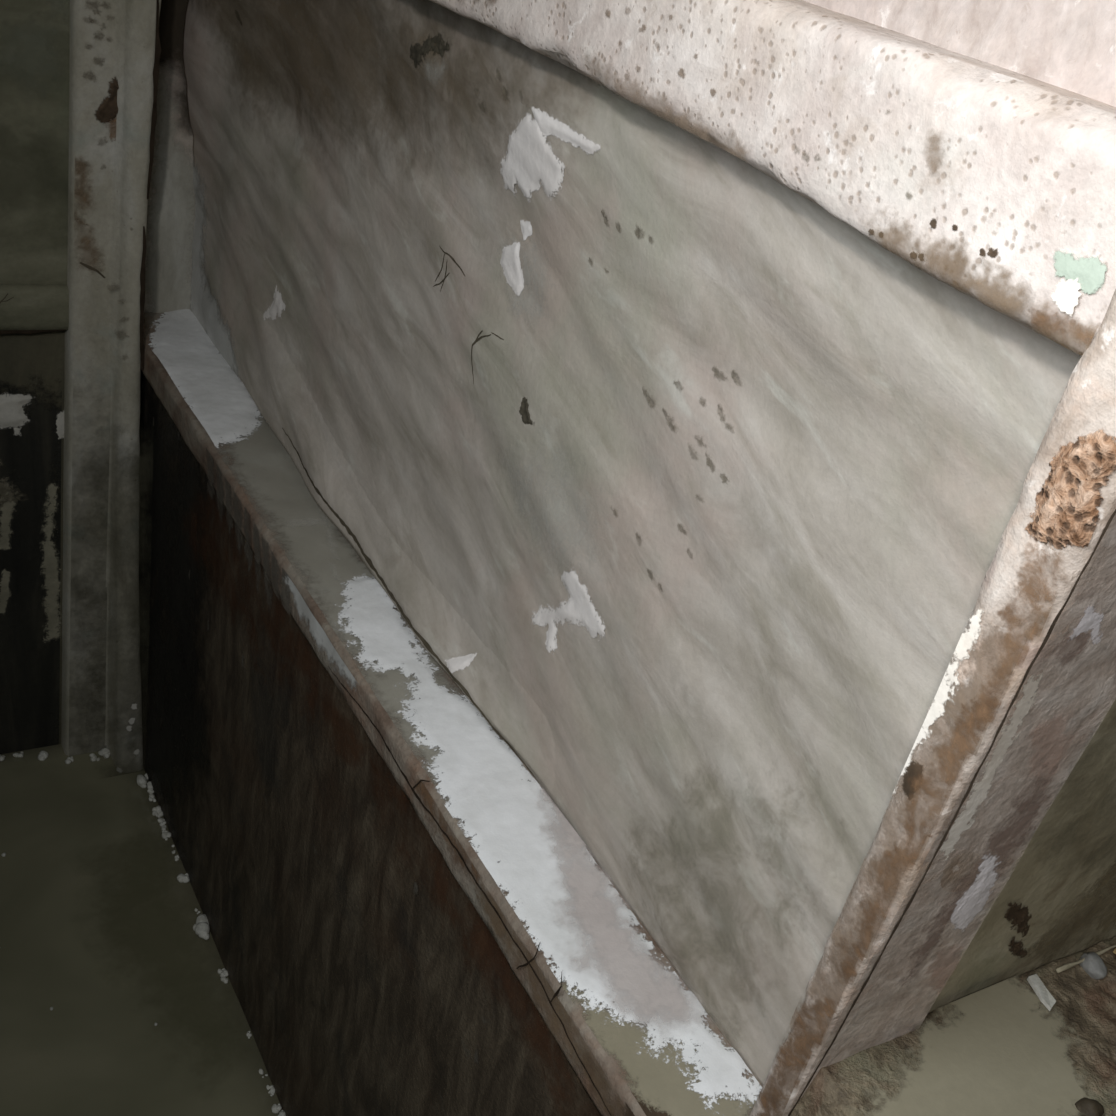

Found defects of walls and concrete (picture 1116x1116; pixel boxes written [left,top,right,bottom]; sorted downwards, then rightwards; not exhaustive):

damp [159,0,192,131]
damp [206,0,515,123]
crack [433,245,465,291]
peeling [1051,251,1107,316]
peeling [0,393,32,436]
peeling [56,411,64,439]
crack [471,331,504,384]
damp [126,75,1050,1116]
rust [939,549,1059,784]
rust [843,777,935,981]
rust [759,999,834,1116]